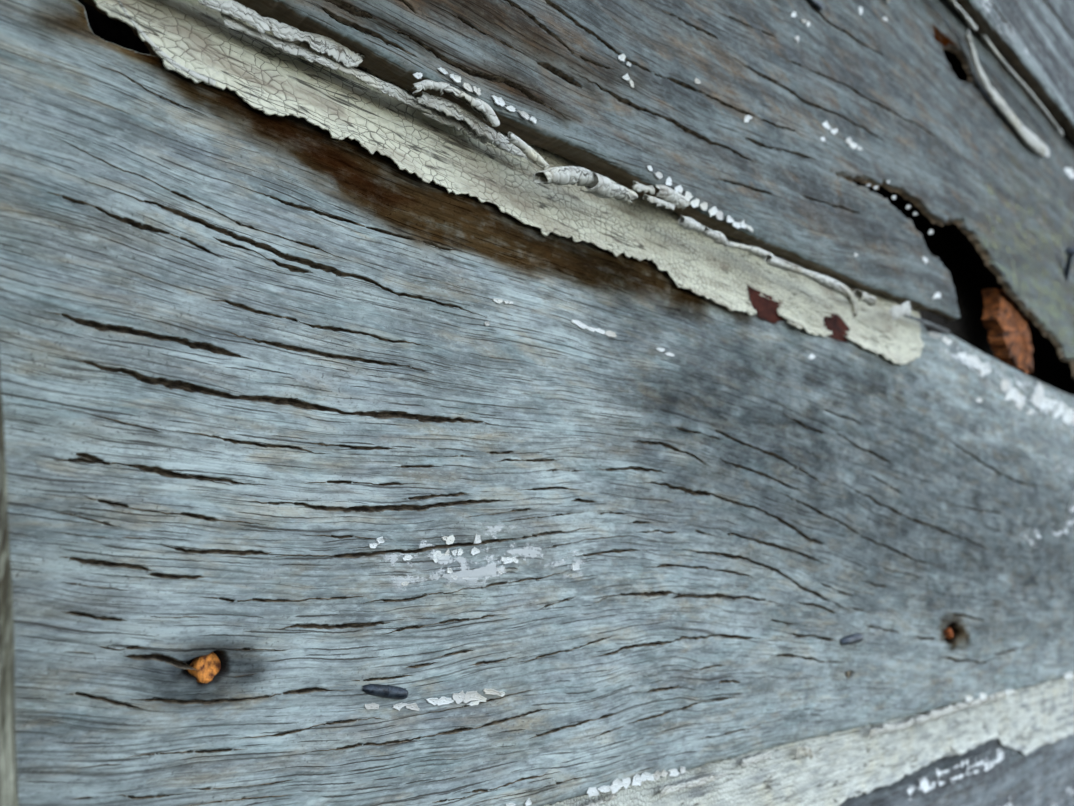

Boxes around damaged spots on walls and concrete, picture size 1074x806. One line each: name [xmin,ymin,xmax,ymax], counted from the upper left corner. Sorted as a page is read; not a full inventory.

peeling [947,0,1064,136]
crack [47,134,487,318]
peeling [94,0,992,375]
crack [49,298,432,371]
crack [48,355,499,425]
peeling [1000,379,1074,425]
peeling [431,533,481,580]
crack [53,408,1018,709]
corrosion [943,621,969,647]
crack [80,665,741,768]
peeling [392,688,505,711]
peeling [505,672,1074,806]